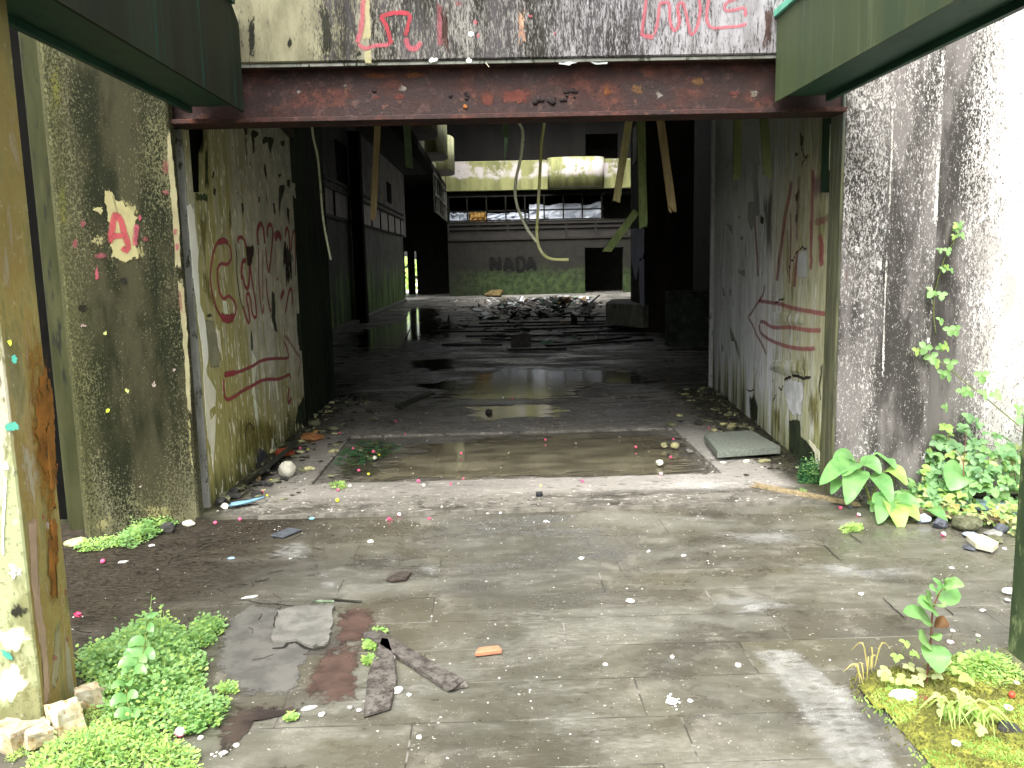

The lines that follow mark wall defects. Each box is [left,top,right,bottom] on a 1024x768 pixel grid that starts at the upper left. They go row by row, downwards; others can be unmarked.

leakage [320,6,333,57]
leakage [357,0,372,64]
corrosion [449,88,578,109]
peeling [235,129,296,222]
peeling [91,190,145,263]
spalling [246,246,254,266]
spalling [283,241,293,286]
peeling [797,250,807,277]
peeling [167,129,221,473]
spalling [784,379,820,469]
corrosion [29,329,59,599]